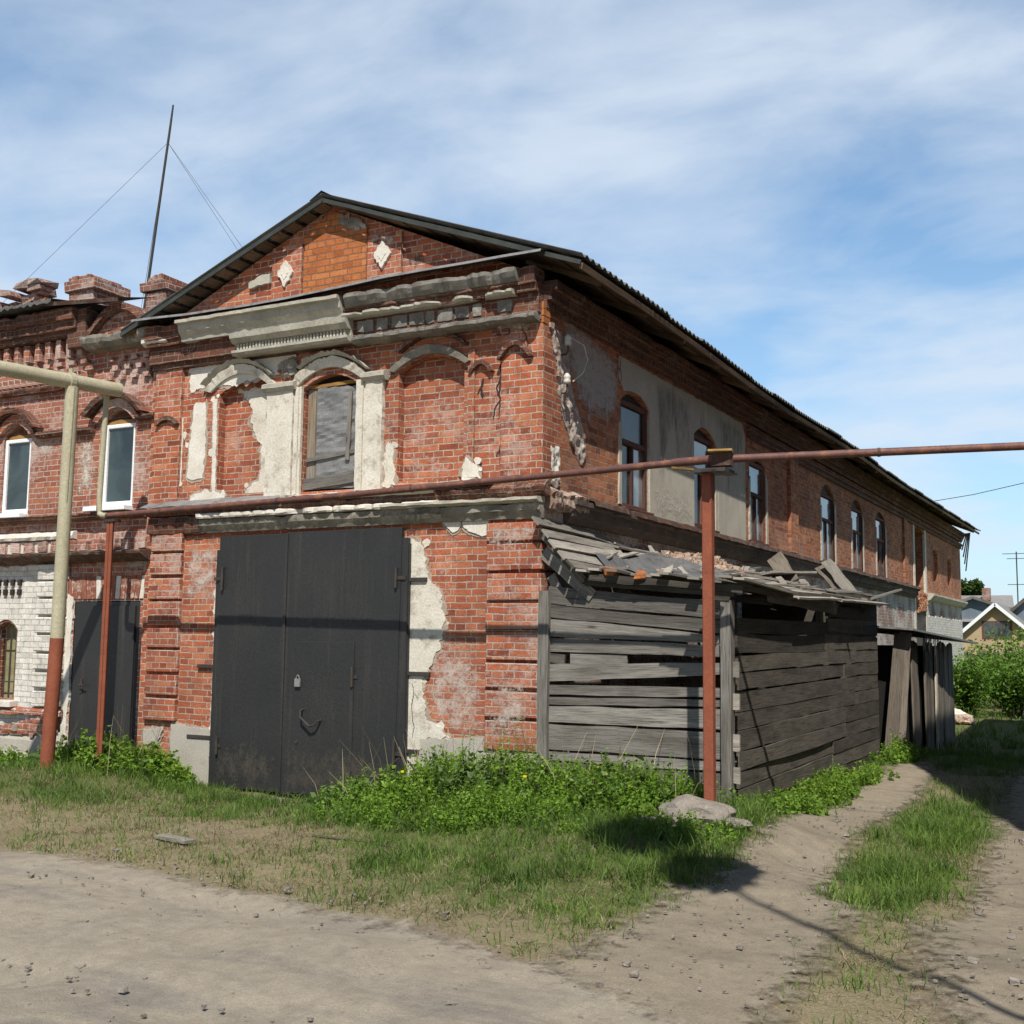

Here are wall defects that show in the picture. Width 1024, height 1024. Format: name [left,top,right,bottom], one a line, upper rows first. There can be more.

peeling [179,354,298,501]
peeling [382,439,399,488]
peeling [459,455,483,480]
peeling [549,321,617,488]
peeling [407,534,452,782]